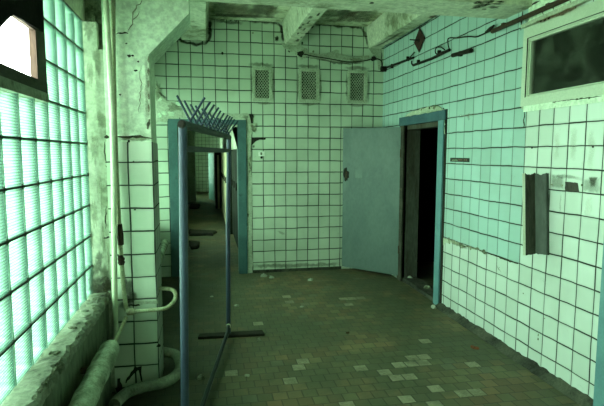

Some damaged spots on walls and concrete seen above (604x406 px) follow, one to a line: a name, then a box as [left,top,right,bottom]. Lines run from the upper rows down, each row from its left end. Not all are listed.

crack [117,1,142,34]
damp [176,5,284,46]
spalling [443,238,518,264]
peeling [68,293,105,339]
spalling [31,350,63,400]